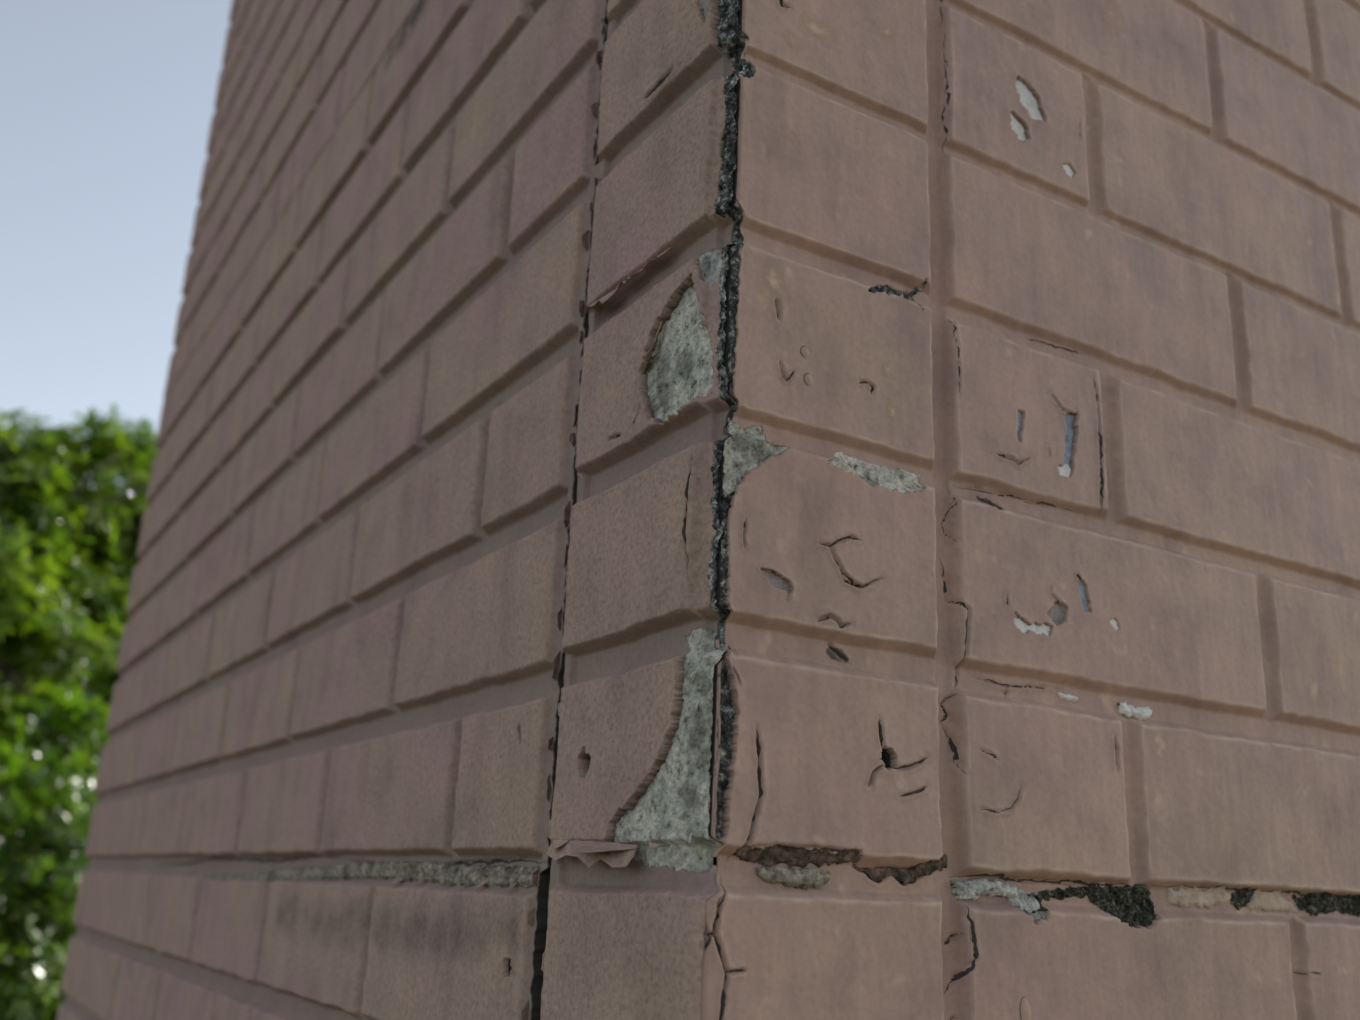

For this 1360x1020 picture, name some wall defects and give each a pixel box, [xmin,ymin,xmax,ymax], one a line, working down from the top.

peeling [1011,79,1043,141]
spalling [532,0,790,887]
peeling [1048,394,1078,477]
spalling [827,451,923,494]
crack [682,468,692,574]
crack [821,536,883,589]
crack [817,616,850,664]
spalling [755,866,831,890]
spalling [950,878,1047,920]
crack [703,727,1360,1020]
peeling [1167,886,1234,909]
peeling [1248,889,1298,914]